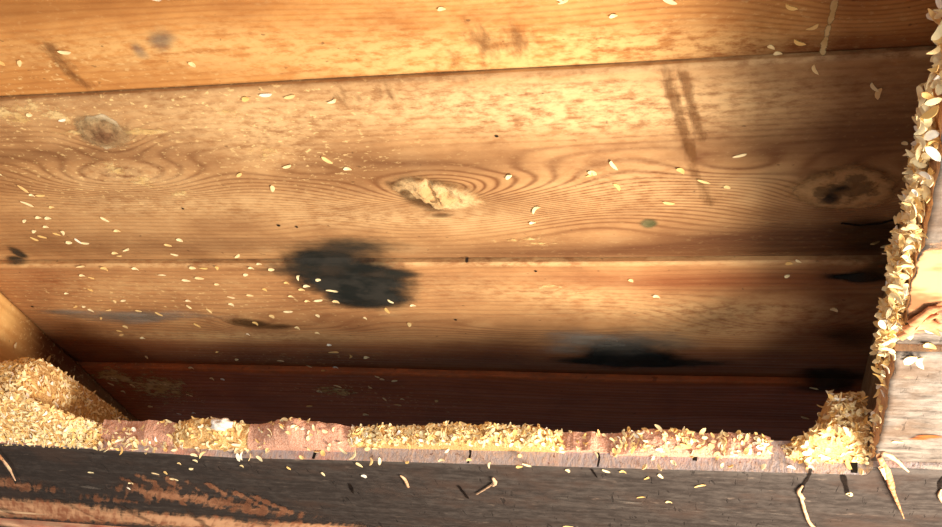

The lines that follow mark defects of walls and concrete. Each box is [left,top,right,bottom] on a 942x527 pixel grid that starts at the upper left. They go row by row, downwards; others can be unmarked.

damp [666,74,700,156]
damp [279,240,415,308]
damp [560,336,718,367]